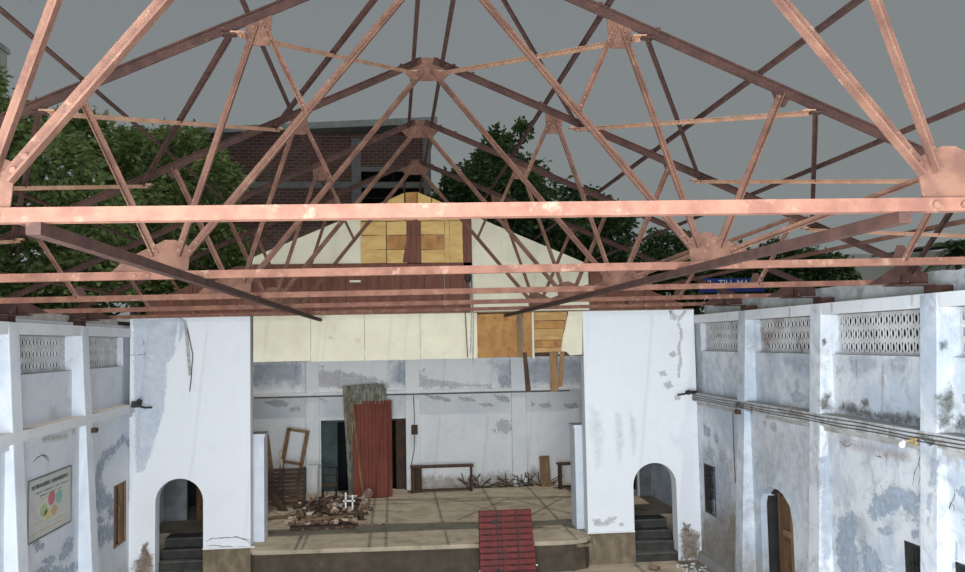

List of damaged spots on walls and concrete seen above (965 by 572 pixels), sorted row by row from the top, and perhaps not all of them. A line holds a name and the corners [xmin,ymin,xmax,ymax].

peeling [33,536,78,572]
peeling [95,435,130,549]
crack [206,536,252,547]
peeling [836,486,920,572]